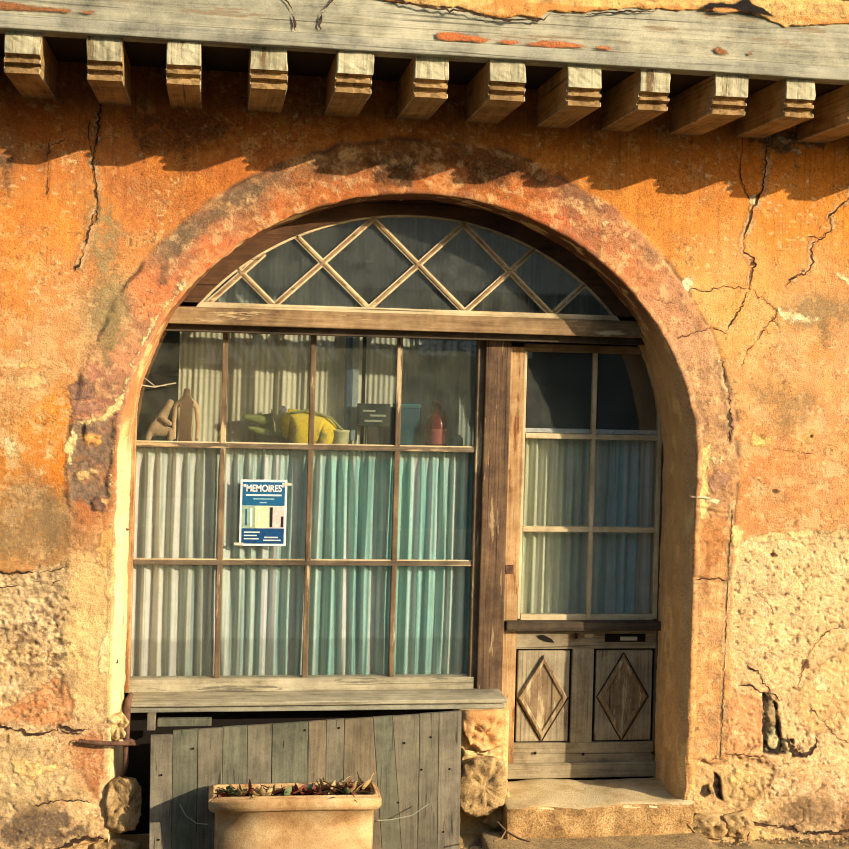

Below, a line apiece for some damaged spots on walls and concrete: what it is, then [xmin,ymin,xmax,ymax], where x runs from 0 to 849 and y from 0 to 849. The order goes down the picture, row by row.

crack [394,0,654,22]
spalling [704,0,773,16]
peeling [436,32,585,48]
crack [46,104,103,271]
leakage [373,162,416,186]
crack [678,136,782,442]
crack [696,500,848,761]
spalling [0,678,75,729]
spalling [797,644,849,732]
crack [0,720,89,743]
spalling [689,693,794,814]
leakage [767,799,849,837]